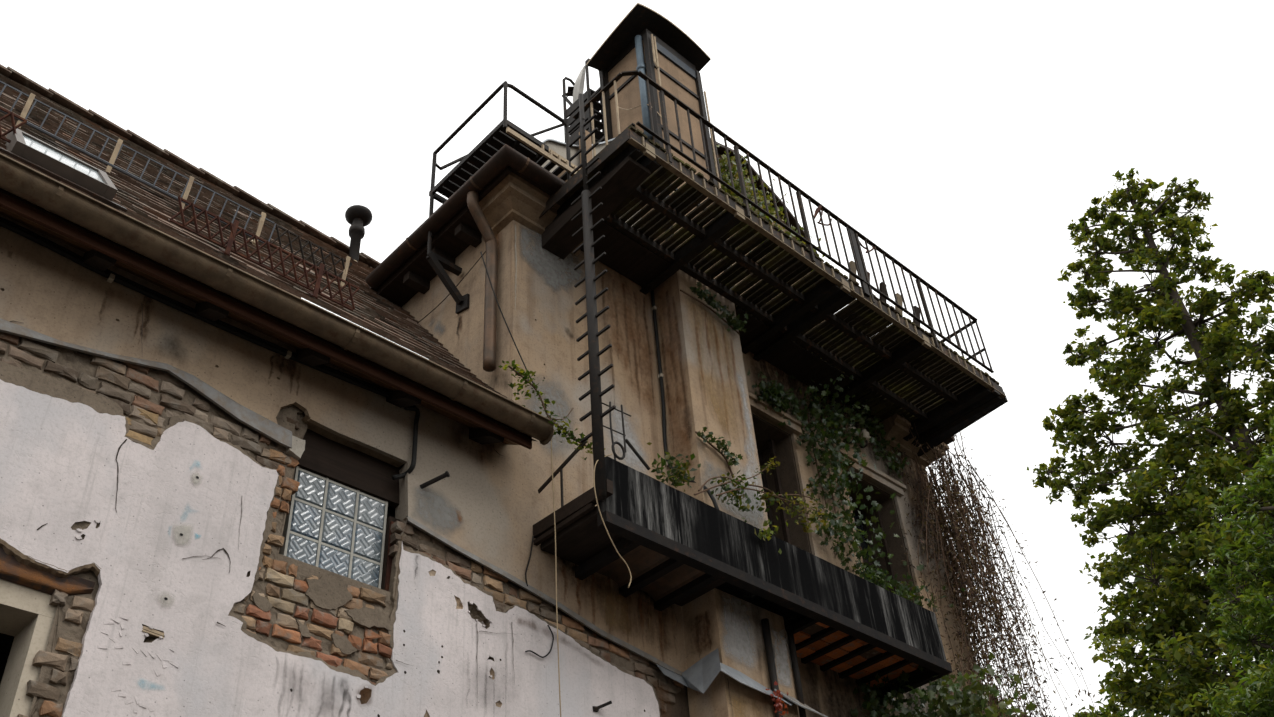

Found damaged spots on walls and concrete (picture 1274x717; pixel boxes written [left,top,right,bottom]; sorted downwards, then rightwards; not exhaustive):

crack [116,439,127,513]
flaking render [0,332,406,717]
flaking render [389,521,684,713]